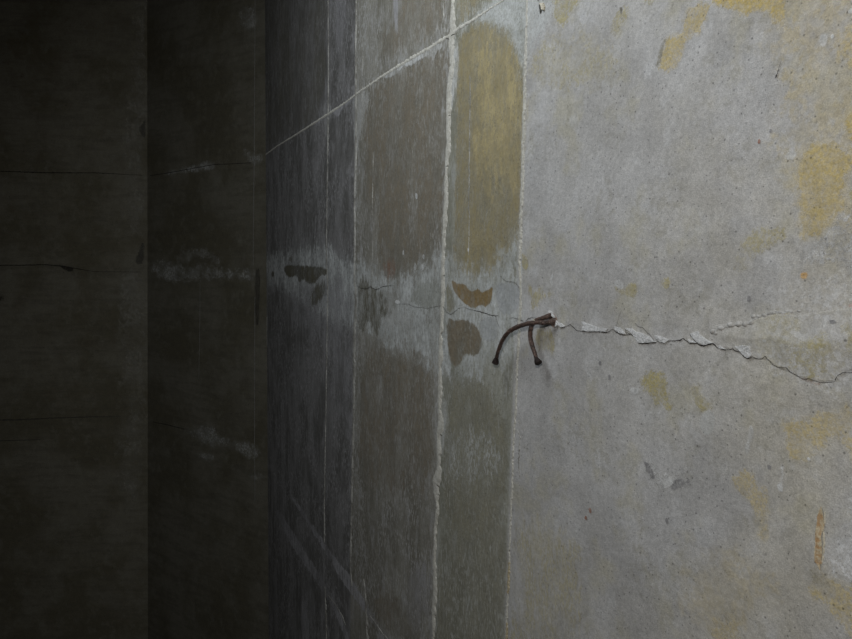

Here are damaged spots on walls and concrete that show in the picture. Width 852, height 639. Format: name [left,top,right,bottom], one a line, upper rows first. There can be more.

damp [656,0,785,70]
damp [798,113,852,236]
damp [239,0,577,639]
crack [558,312,852,383]